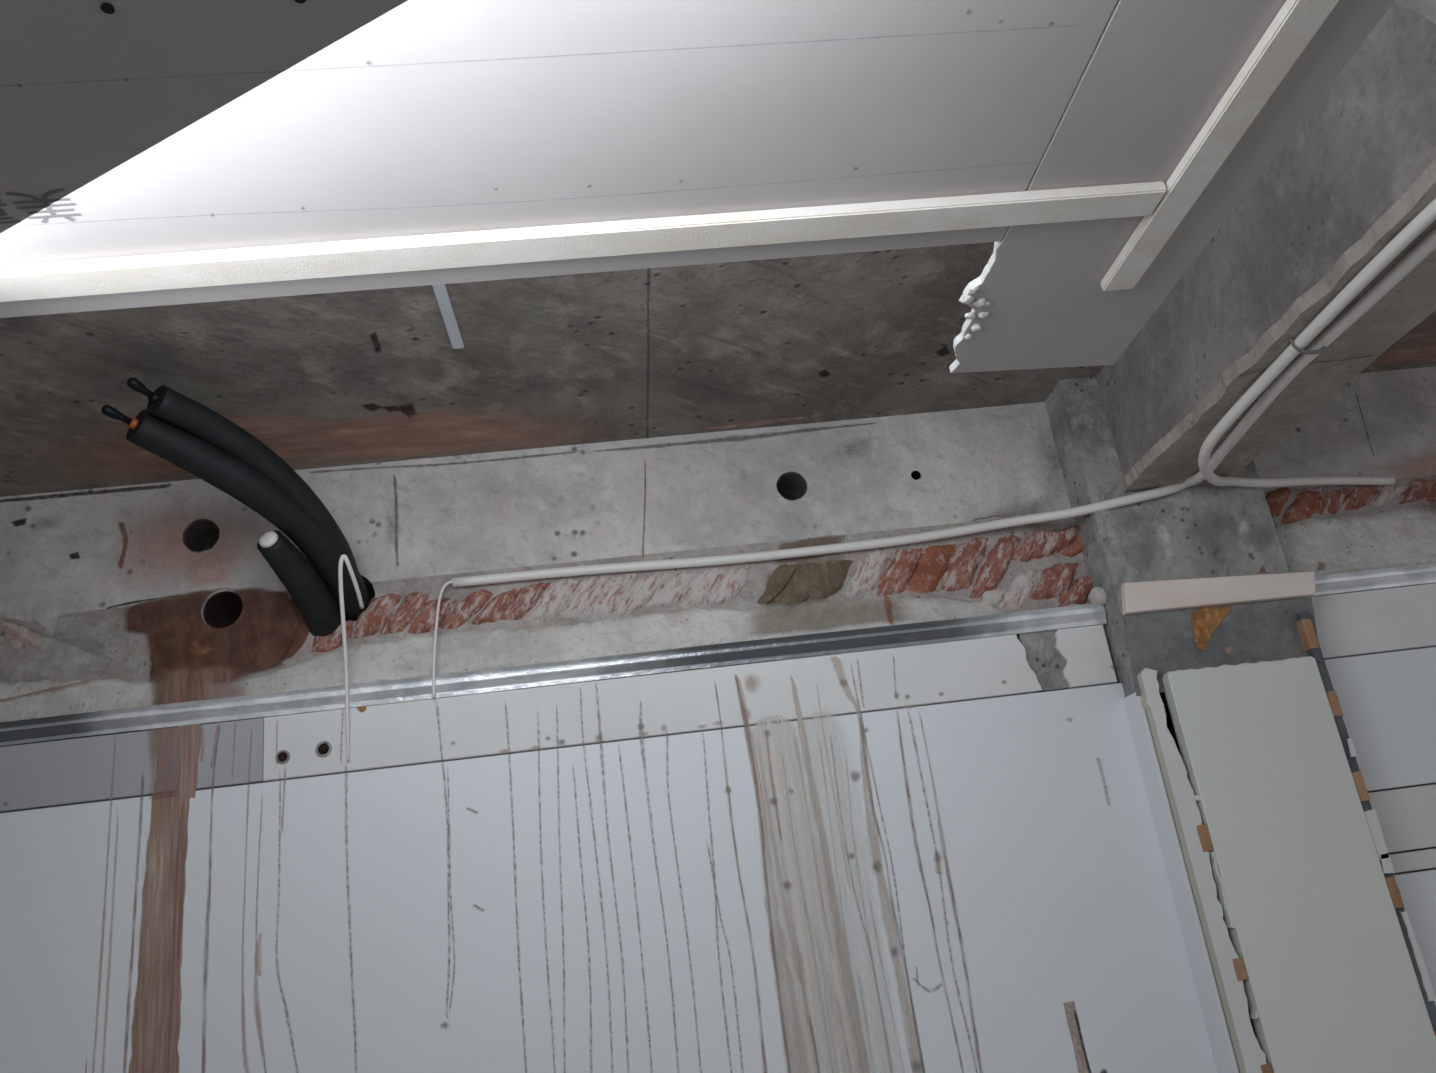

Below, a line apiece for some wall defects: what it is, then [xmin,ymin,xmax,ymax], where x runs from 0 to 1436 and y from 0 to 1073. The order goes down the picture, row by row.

spalling [959,286,990,339]
flaking render [282,566,753,661]
flaking render [757,514,1093,610]
leakage [501,707,527,1073]
leakage [539,789,565,1024]
leakage [557,689,628,1068]
leakage [651,817,678,1058]
leakage [667,737,700,1066]
leakage [701,726,743,1073]
leakage [727,786,748,921]
leakage [736,656,981,1073]